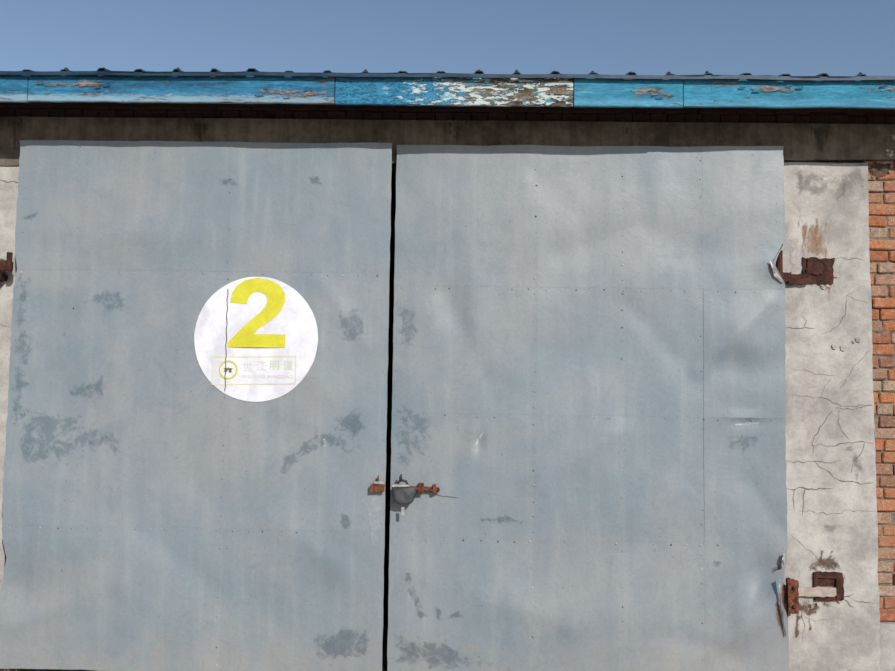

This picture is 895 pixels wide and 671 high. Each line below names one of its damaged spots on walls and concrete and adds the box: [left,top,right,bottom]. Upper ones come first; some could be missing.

rust [798,219,827,254]
crack [789,405,873,515]